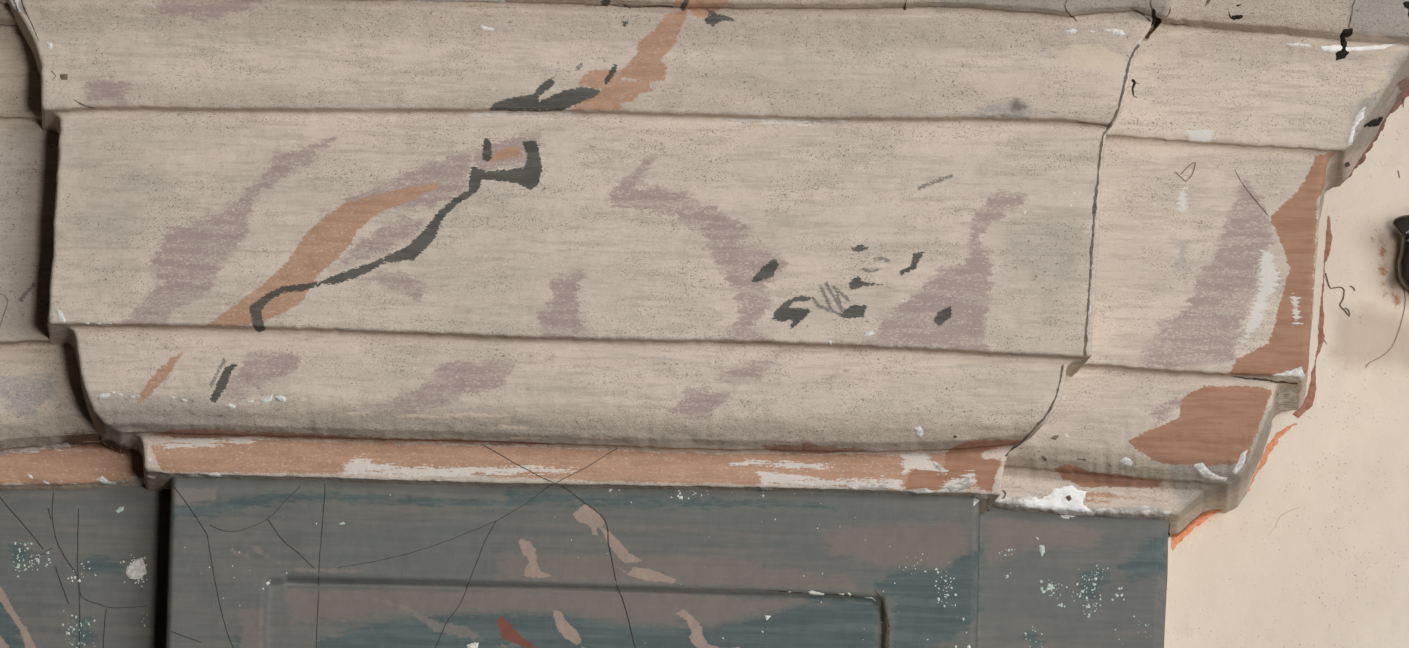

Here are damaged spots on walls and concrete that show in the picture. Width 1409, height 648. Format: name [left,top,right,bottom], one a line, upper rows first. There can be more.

crack [1005,0,1189,457]
peeling [1194,216,1333,491]